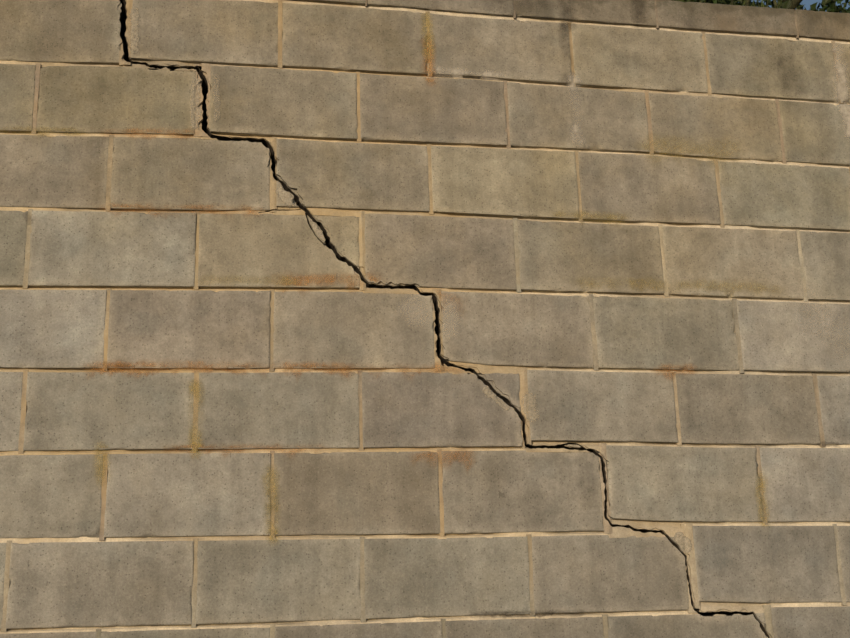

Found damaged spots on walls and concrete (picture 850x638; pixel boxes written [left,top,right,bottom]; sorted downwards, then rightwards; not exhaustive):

crack [119,0,769,638]